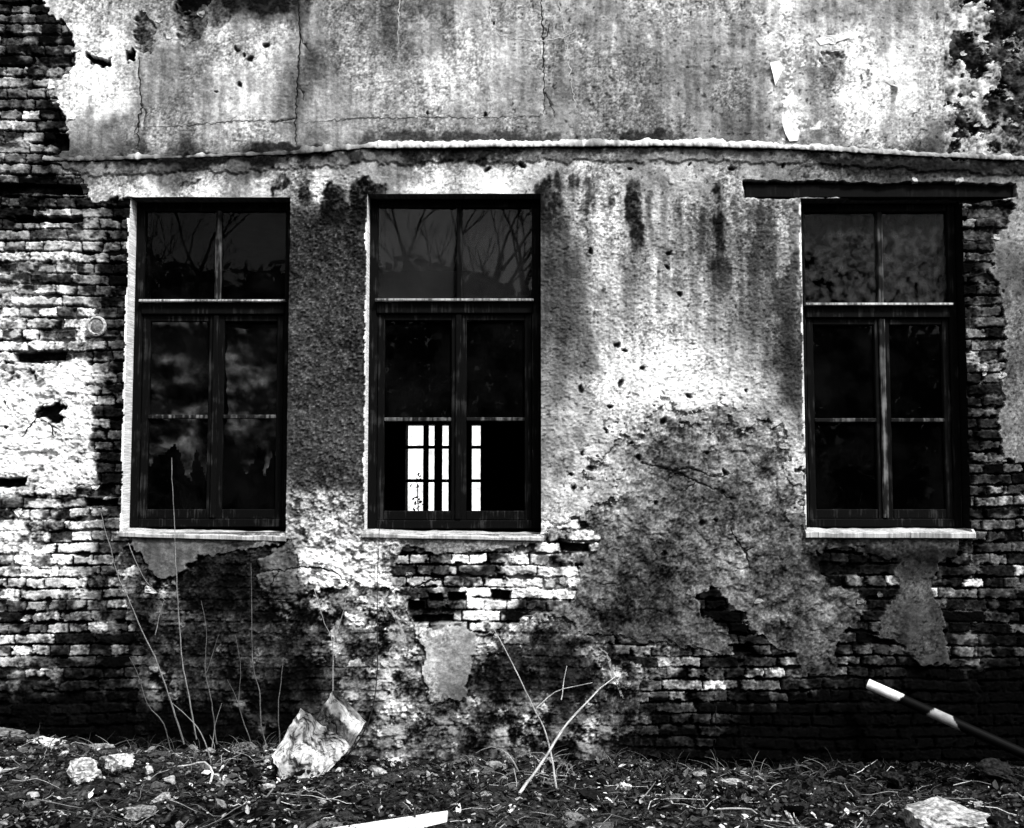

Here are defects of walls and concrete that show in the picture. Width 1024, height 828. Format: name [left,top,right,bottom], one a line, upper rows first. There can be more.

crack [134,0,577,153]
peeling [942,0,1024,162]
leakage [534,170,595,307]
leakage [609,179,653,251]
leakage [698,183,801,387]
spalling [0,0,149,748]
spalling [390,162,1024,770]